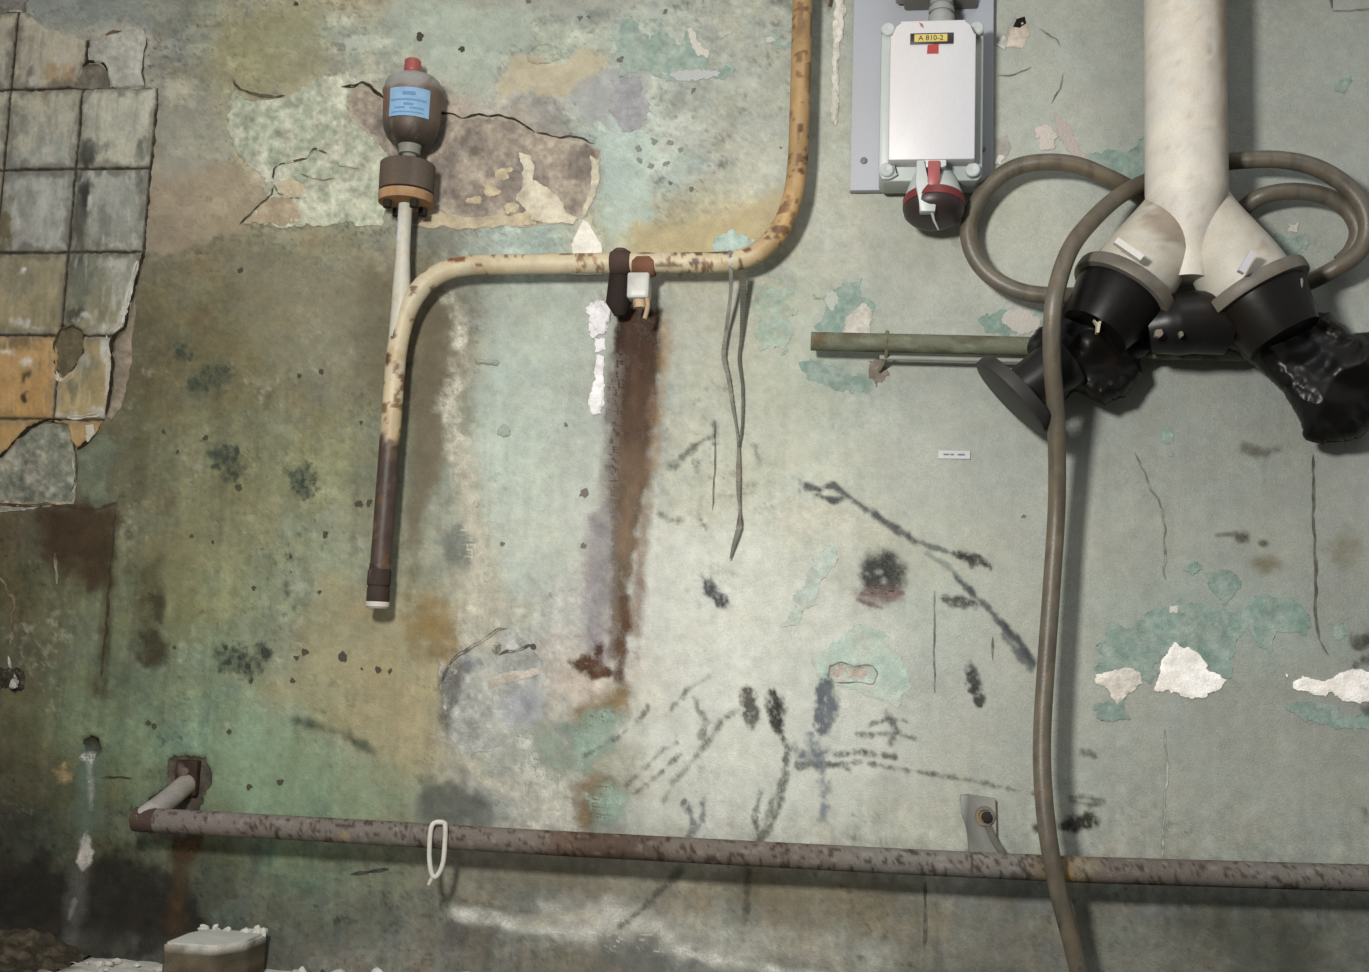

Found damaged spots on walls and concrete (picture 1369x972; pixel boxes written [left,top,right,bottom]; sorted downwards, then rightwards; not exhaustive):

flaking render [227,71,399,229]
crack [342,81,383,98]
flaking render [411,112,602,253]
flaking render [0,252,143,512]
damp [44,506,165,667]
rust [574,308,666,724]
crack [1134,452,1167,580]
peeling [1093,561,1311,722]
crack [1312,455,1328,654]
damp [0,752,205,956]
rust [570,777,612,829]
damp [451,897,812,972]